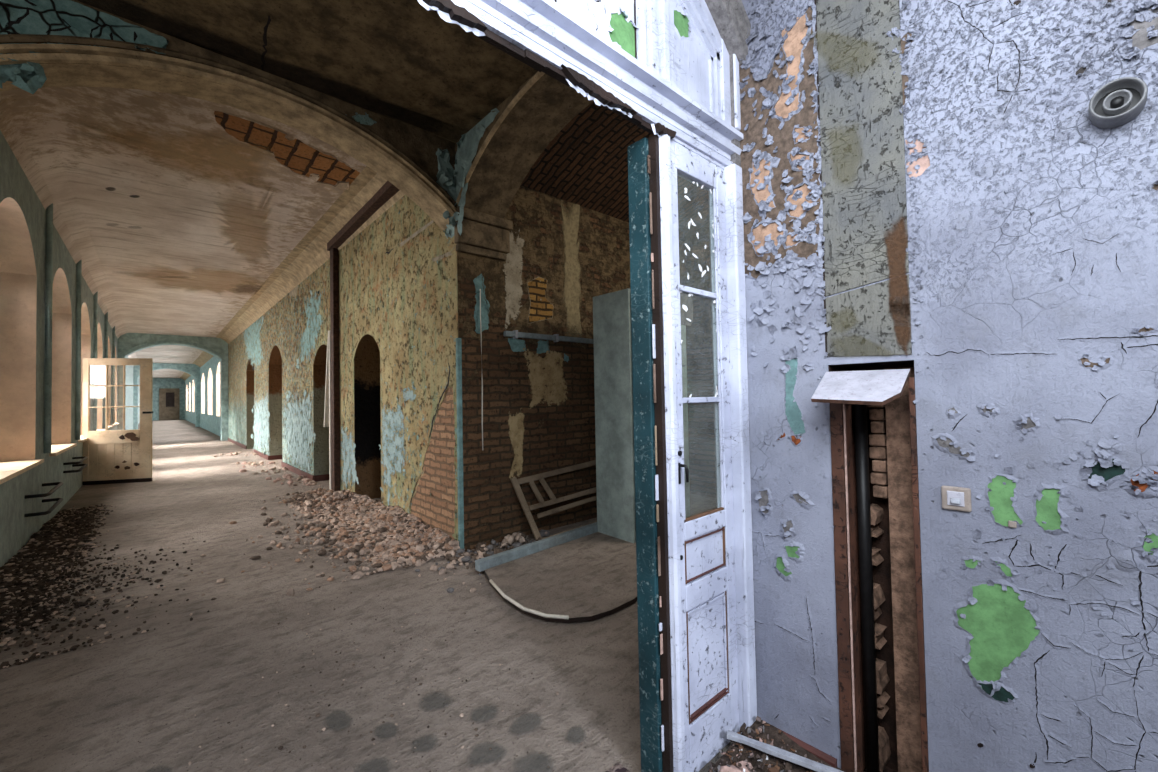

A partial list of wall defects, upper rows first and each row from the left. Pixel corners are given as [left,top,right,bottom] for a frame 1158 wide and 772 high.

peeling [607,7,641,58]
spalling [211,110,360,190]
peeling [887,0,1158,355]
peeling [739,0,831,447]
crack [1053,233,1123,276]
crack [924,333,1158,359]
crack [949,412,969,433]
crack [1061,392,1122,425]
crack [1134,399,1158,438]
peeling [341,426,359,488]
peeling [931,433,1158,705]
crack [980,532,1158,772]